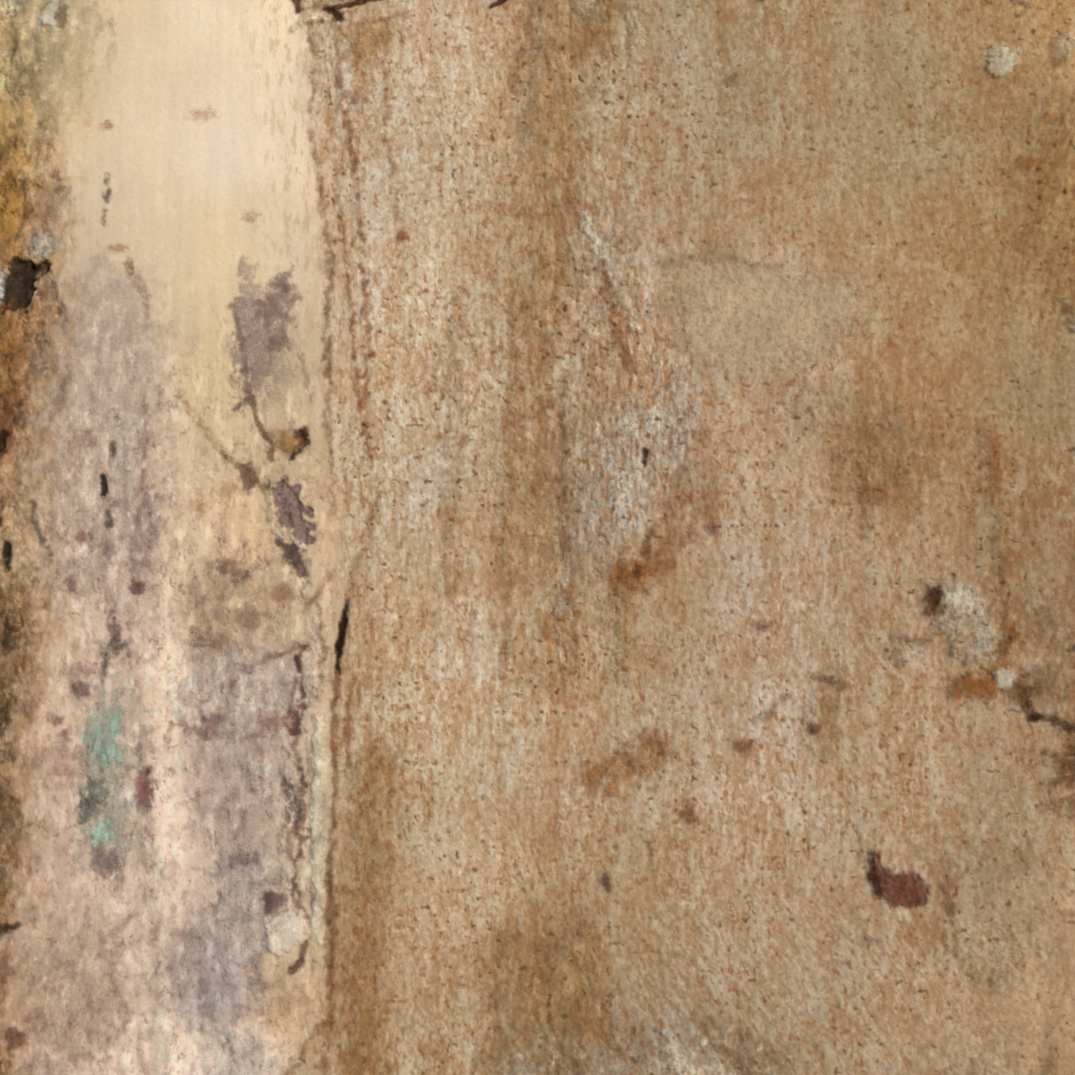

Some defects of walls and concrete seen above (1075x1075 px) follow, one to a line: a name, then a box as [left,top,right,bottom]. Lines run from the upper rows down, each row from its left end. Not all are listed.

crack [489,0,536,93]
crack [291,0,407,459]
peeling [0,234,168,613]
water stain [39,662,154,878]
water stain [100,611,129,675]
water stain [166,731,284,1063]
water stain [189,559,269,650]
crack [323,548,366,1066]
peeling [926,572,1009,664]
crack [1016,664,1075,733]